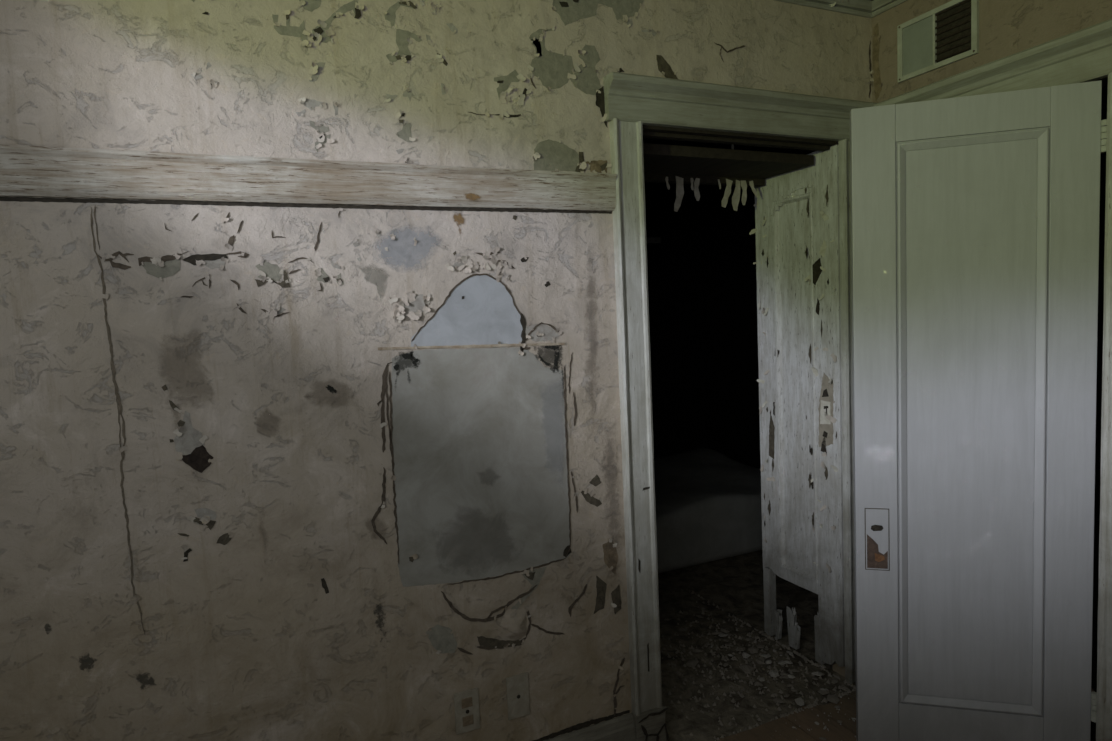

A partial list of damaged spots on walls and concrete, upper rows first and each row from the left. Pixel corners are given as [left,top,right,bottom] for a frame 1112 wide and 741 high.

peeling [271,0,364,48]
peeling [383,0,457,66]
peeling [494,0,659,127]
peeling [656,55,678,79]
peeling [531,139,612,174]
peeling [255,259,291,288]
crack [271,208,343,274]
peeling [315,261,344,291]
crack [91,207,249,634]
flaking render [162,385,215,473]
flaking render [388,247,602,587]
crack [441,353,587,637]